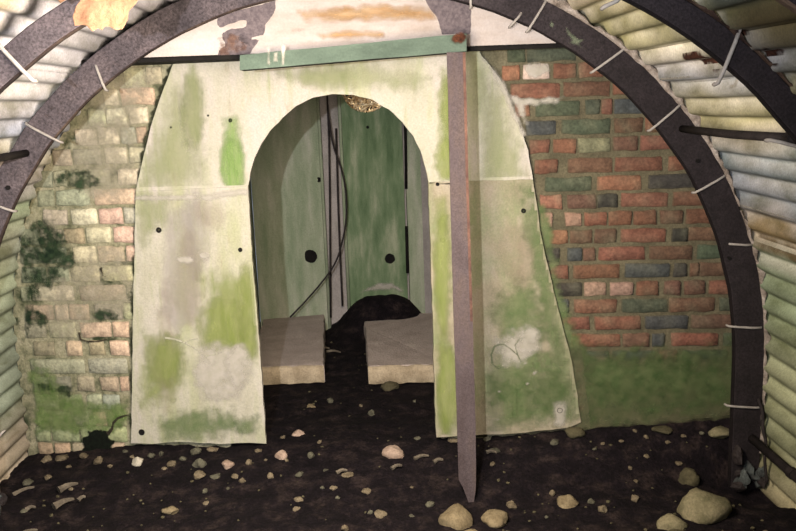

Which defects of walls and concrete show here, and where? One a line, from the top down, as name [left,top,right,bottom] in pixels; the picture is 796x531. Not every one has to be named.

peeling [217,1,275,55]
corrosion [683,51,719,70]
water stain [136,141,247,200]
water stain [436,140,450,177]
water stain [544,0,793,406]
water stain [194,285,255,399]
hole [82,415,129,451]
water stain [239,421,253,433]
water stain [555,404,565,426]